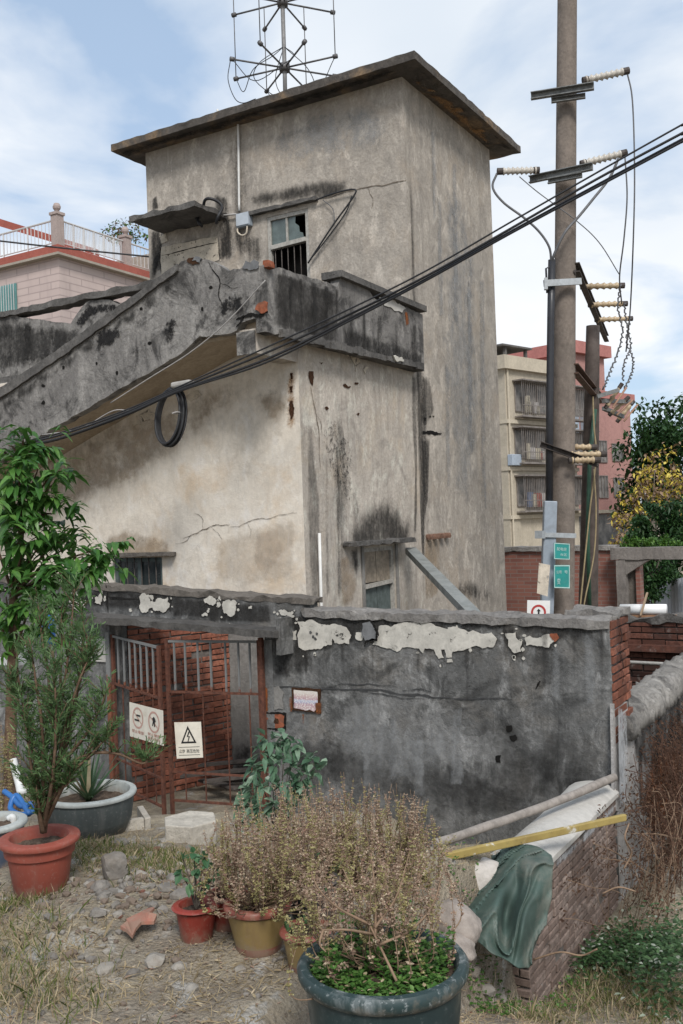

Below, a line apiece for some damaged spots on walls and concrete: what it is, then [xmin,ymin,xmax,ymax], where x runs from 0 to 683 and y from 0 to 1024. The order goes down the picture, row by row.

leakage [255,183,343,202]
spalling [236,301,268,327]
mould [164,319,176,342]
leakage [276,275,433,552]
crack [182,513,290,543]
peeling [129,593,173,613]
peeling [202,596,252,624]
peeling [273,610,559,667]